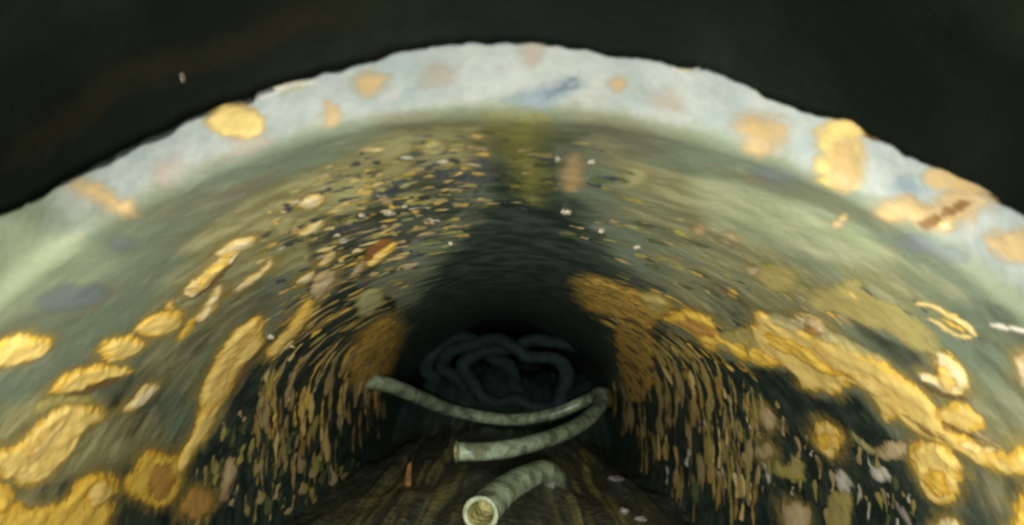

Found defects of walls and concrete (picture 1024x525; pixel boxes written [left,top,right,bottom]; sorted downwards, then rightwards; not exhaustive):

corrosion [204,104,264,139]
corrosion [815,120,878,190]
corrosion [876,169,992,231]
corrosion [0,134,492,525]
corrosion [573,258,1024,525]